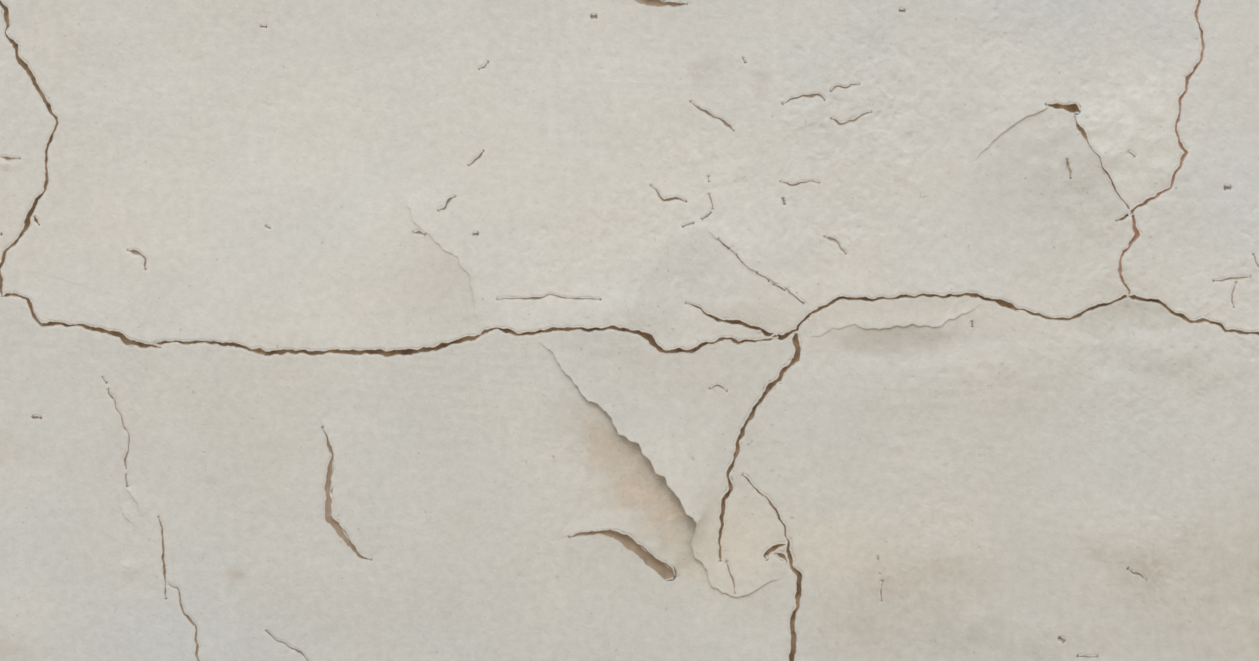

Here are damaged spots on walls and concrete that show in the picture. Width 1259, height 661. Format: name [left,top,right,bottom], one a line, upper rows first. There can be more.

crack [0,0,1259,357]
crack [103,379,130,486]
crack [159,519,200,661]
crack [267,631,308,661]
peeling [321,403,399,560]
peeling [537,330,852,597]
crack [718,333,801,560]
crack [743,475,802,661]